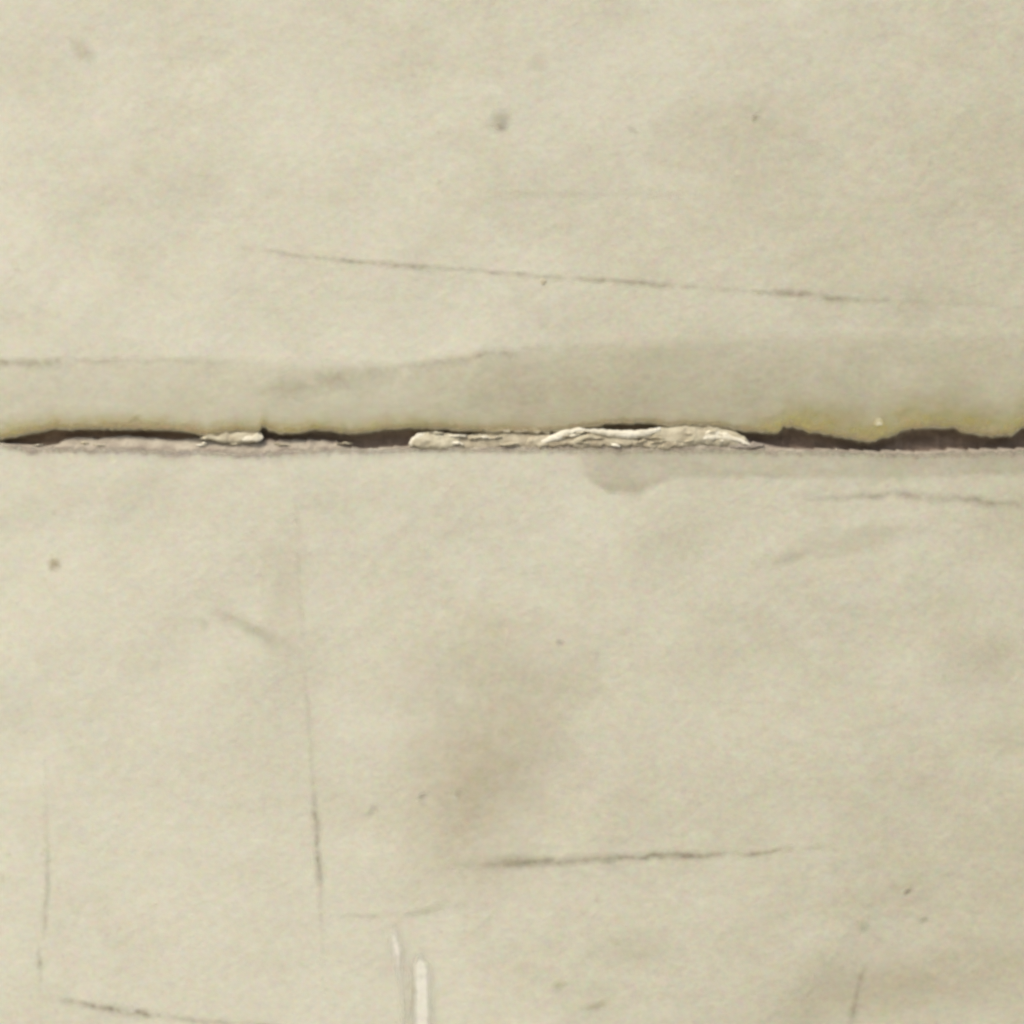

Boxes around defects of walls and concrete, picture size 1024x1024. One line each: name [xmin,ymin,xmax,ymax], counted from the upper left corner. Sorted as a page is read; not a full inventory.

peeling [200,432,263,444]
crack [0,419,1024,456]
peeling [409,426,764,451]